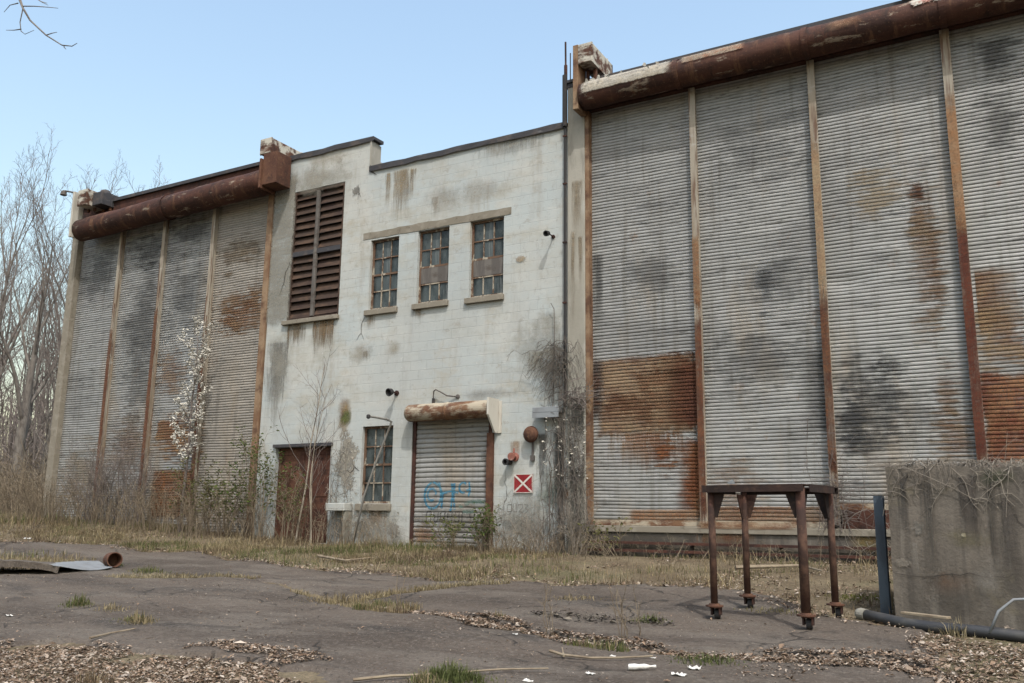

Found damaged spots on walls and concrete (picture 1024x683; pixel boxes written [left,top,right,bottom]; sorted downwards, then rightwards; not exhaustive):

rust [204,283,262,336]
damp [267,324,305,397]
damp [386,169,416,202]
rust [593,237,823,543]
rust [855,169,946,331]
rust [939,96,1024,464]